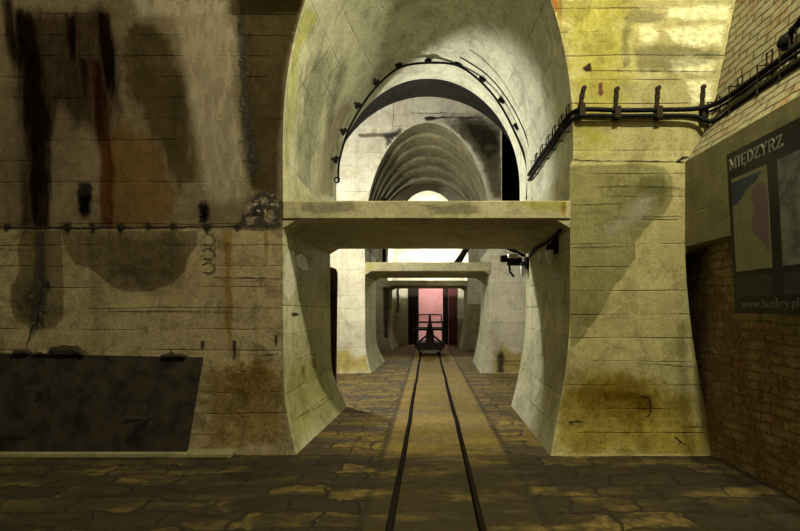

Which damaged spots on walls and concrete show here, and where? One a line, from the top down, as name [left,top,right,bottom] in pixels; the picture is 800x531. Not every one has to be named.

water stain [3,0,118,334]
corrosion [81,59,113,223]
crack [0,225,272,349]
water stain [136,0,259,201]
peeling [241,191,281,228]